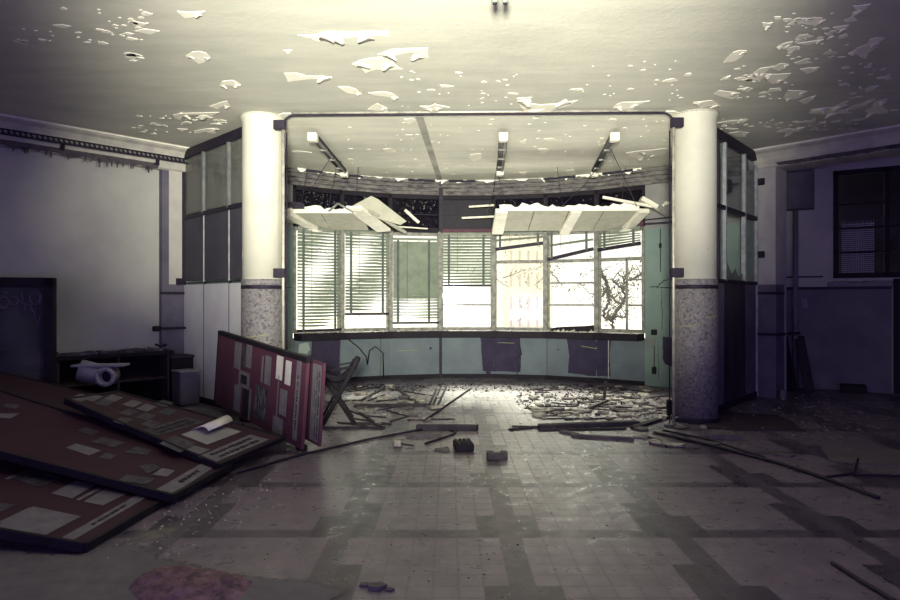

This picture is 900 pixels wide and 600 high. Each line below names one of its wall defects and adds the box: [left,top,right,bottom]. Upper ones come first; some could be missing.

peeling [13,9,159,45]
peeling [177,11,205,19]
peeling [298,31,390,45]
peeling [124,52,145,62]
peeling [131,101,230,135]
peeling [186,51,210,64]
peeling [219,80,241,89]
peeling [284,73,403,112]
peeling [352,48,428,81]
peeling [420,104,449,112]
peeling [480,74,588,125]
peeling [654,4,898,137]